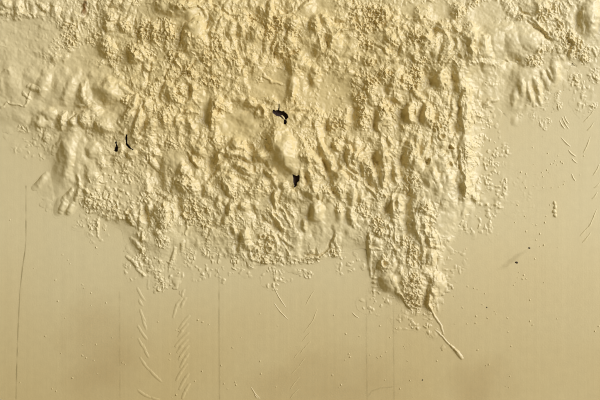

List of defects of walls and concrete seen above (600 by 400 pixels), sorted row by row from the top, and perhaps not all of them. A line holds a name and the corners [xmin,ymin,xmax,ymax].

spalling [31,0,546,360]